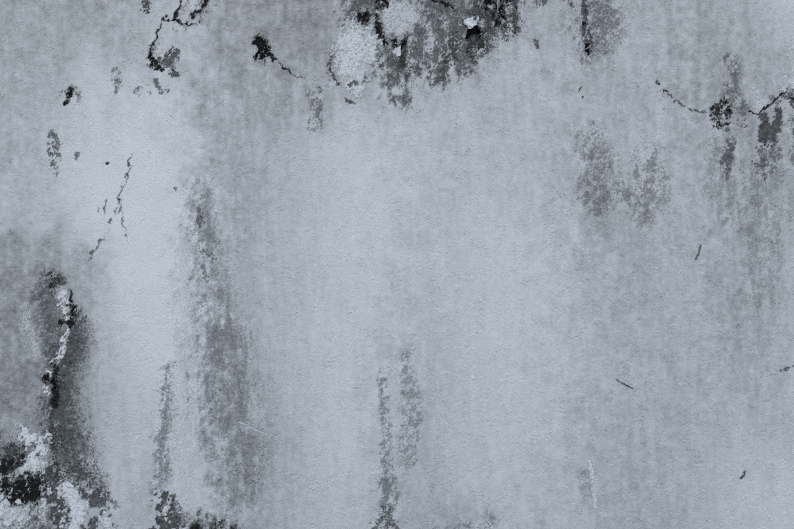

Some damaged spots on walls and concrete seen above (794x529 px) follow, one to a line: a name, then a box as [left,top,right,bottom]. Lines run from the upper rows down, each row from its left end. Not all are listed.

crack [148,0,209,60]
crack [267,53,302,78]
water stain [333,0,518,109]
water stain [563,0,620,62]
crack [748,92,794,115]
peeling [0,271,117,529]
peeling [151,491,185,529]